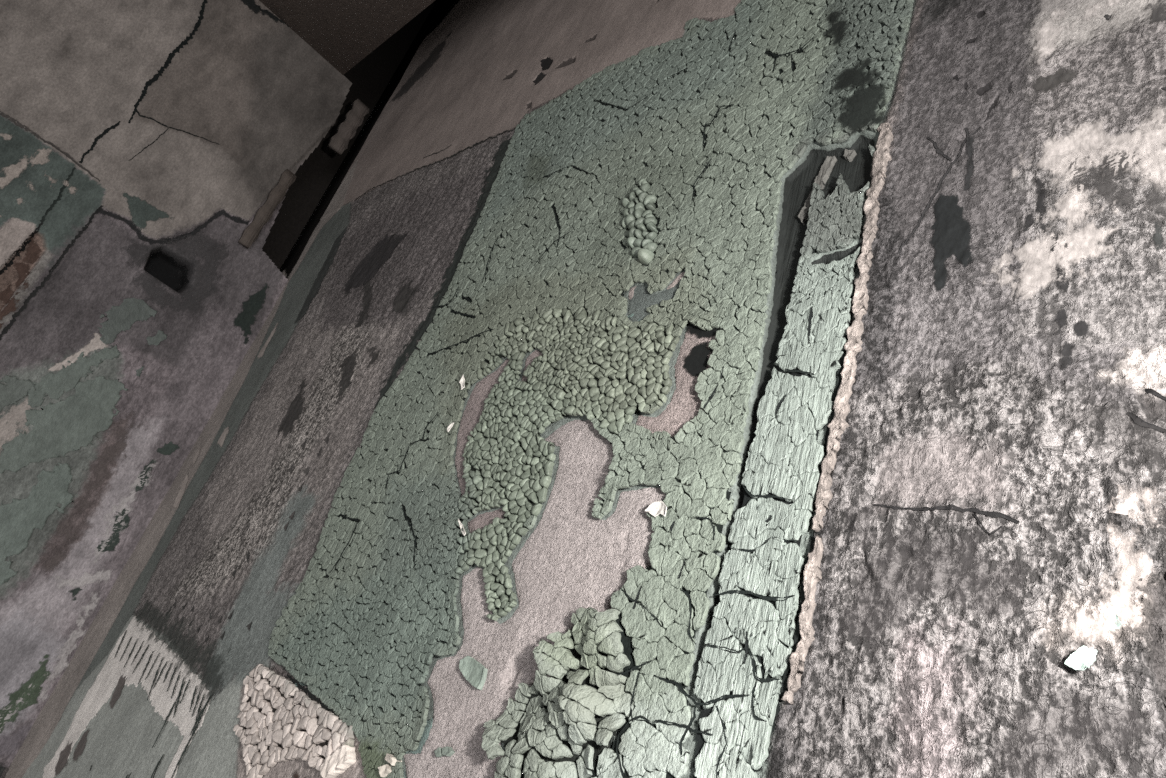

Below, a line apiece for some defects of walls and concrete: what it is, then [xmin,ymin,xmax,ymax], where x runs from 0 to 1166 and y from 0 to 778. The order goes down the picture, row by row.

water stain [820,6,850,49]
water stain [831,57,887,142]
peeling [0,148,52,204]
crack [0,0,218,340]
rust [0,237,42,328]
crack [268,0,914,778]
flaking render [636,331,718,437]
crack [874,504,1019,535]
peeling [0,462,157,729]
flaking render [378,420,667,778]
peeling [42,615,211,778]
peeling [233,664,356,778]